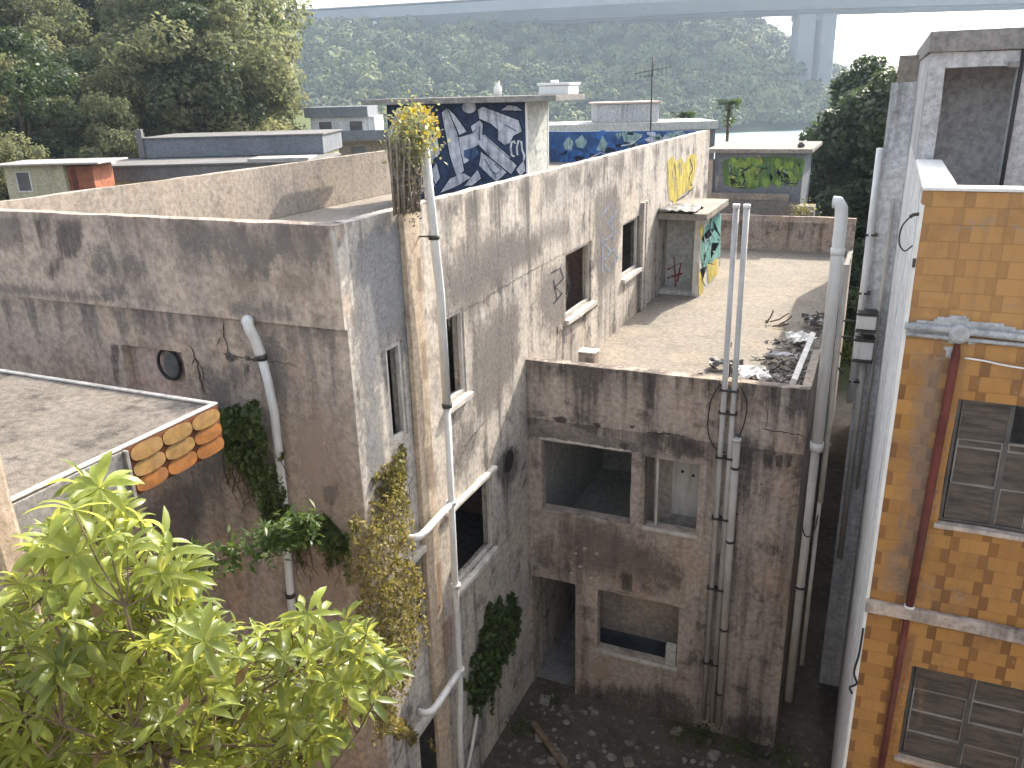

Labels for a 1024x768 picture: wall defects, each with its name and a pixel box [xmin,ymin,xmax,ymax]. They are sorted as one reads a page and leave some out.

crack [190,320,296,396]
water stain [736,434,757,501]
water stain [577,681,701,726]